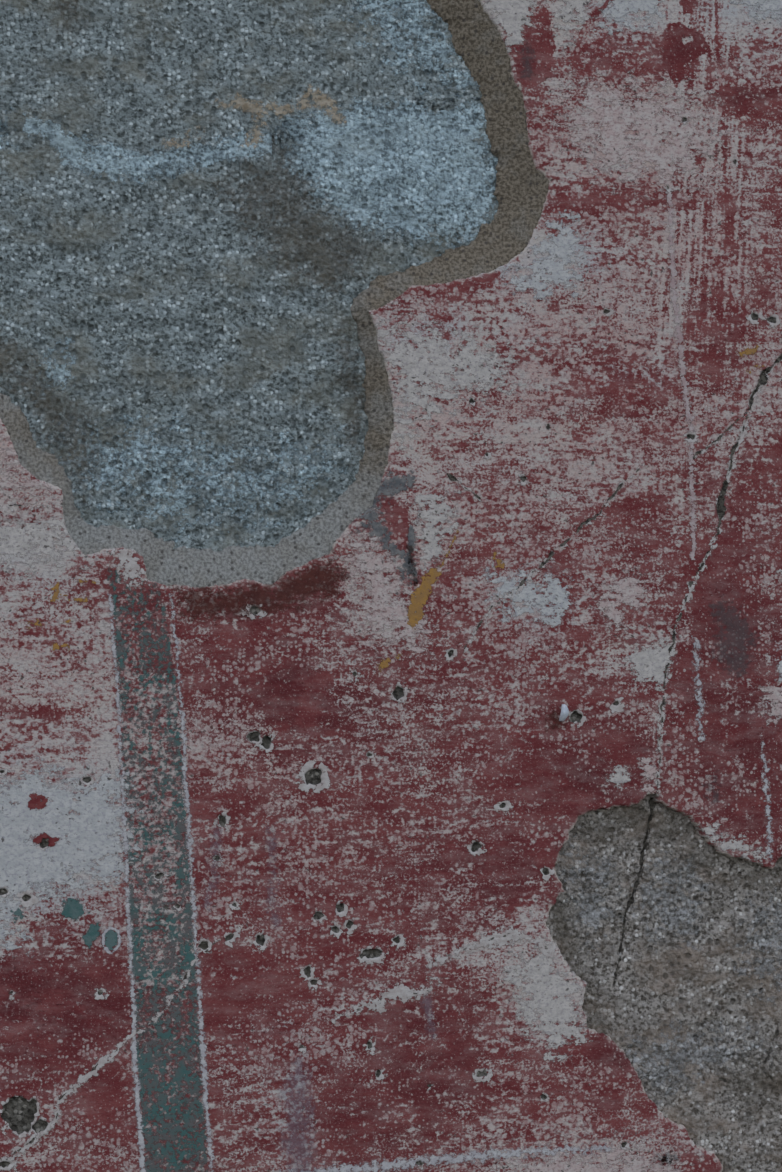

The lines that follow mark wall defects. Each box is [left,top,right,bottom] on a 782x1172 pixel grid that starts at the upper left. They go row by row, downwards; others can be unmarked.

peeling [552,65,739,199]
spalling [0,0,667,661]
crack [462,469,640,653]
crack [613,354,782,985]
spalling [295,760,330,793]
spalling [467,839,487,856]
spalling [313,900,357,939]
spalling [300,966,322,991]
spalling [357,934,406,964]
spalling [487,758,782,1172]
spalling [363,1037,376,1055]
spalling [472,1068,493,1083]